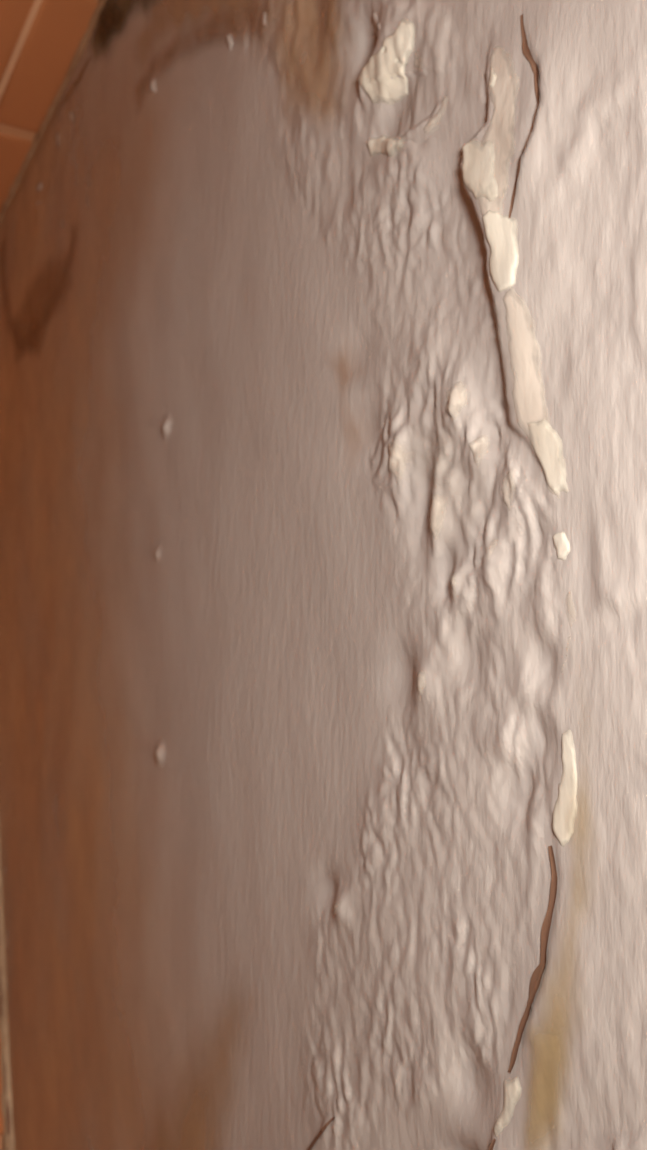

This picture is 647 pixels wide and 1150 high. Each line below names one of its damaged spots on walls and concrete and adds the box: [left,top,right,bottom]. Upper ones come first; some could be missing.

leakage [94,0,149,53]
leakage [290,0,332,100]
crack [508,14,540,219]
peeling [244,0,647,1150]